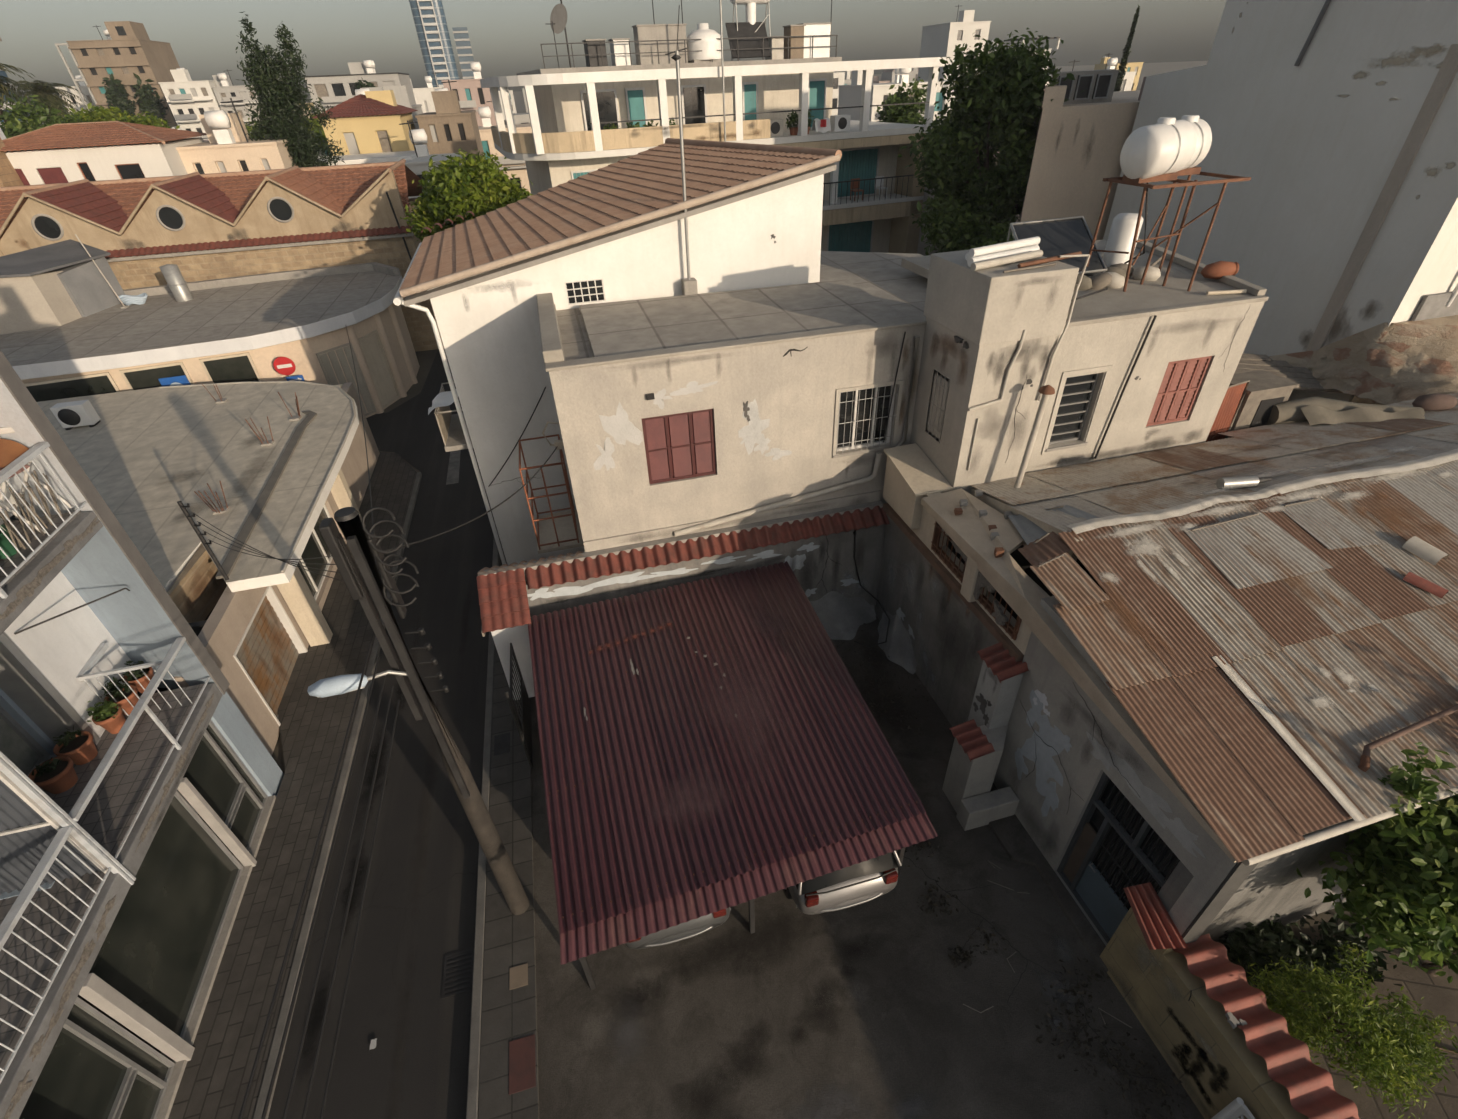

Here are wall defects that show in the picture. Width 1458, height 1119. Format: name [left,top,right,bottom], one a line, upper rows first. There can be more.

peeling [653,381,718,409]
peeling [593,402,643,471]
peeling [1015,690,1206,859]